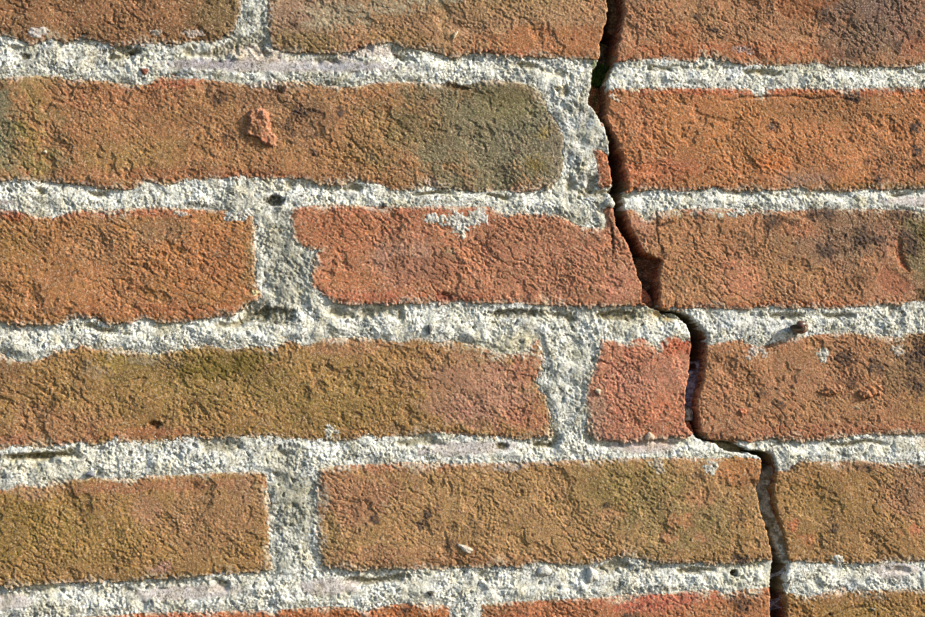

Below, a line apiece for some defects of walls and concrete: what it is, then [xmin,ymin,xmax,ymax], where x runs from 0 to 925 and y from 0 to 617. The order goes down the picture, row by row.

crack [579,0,788,617]